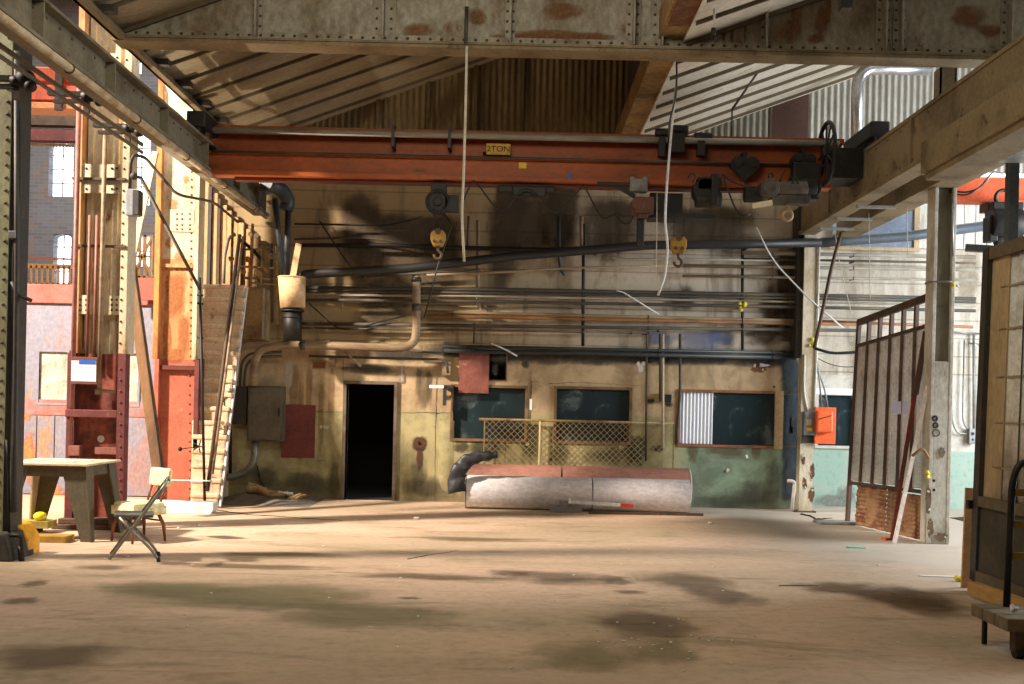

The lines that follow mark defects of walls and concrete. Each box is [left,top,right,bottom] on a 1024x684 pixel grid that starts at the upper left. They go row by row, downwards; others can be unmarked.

rust [406,25,429,36]
rust [515,4,609,40]
rust [954,6,1000,36]
leakage [491,189,637,287]
peeling [801,454,815,502]